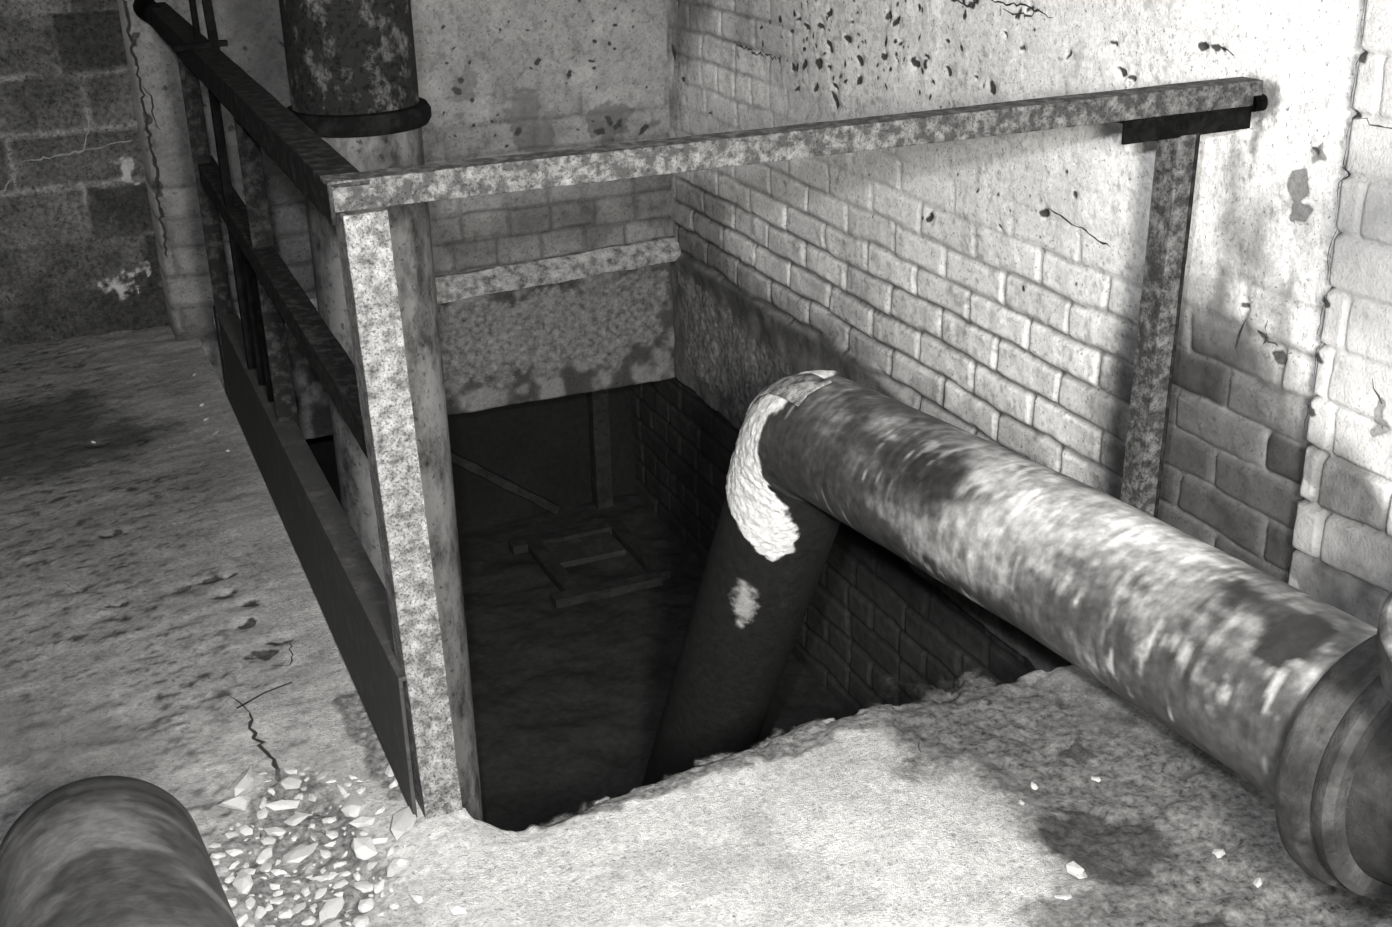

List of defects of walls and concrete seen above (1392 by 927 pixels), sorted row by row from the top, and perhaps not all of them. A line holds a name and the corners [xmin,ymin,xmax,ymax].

crack [952,0,1053,19]
peeling [1198,42,1226,52]
peeling [1287,145,1326,222]
crack [1050,209,1110,247]
crack [1235,0,1392,578]
crack [228,695,286,801]